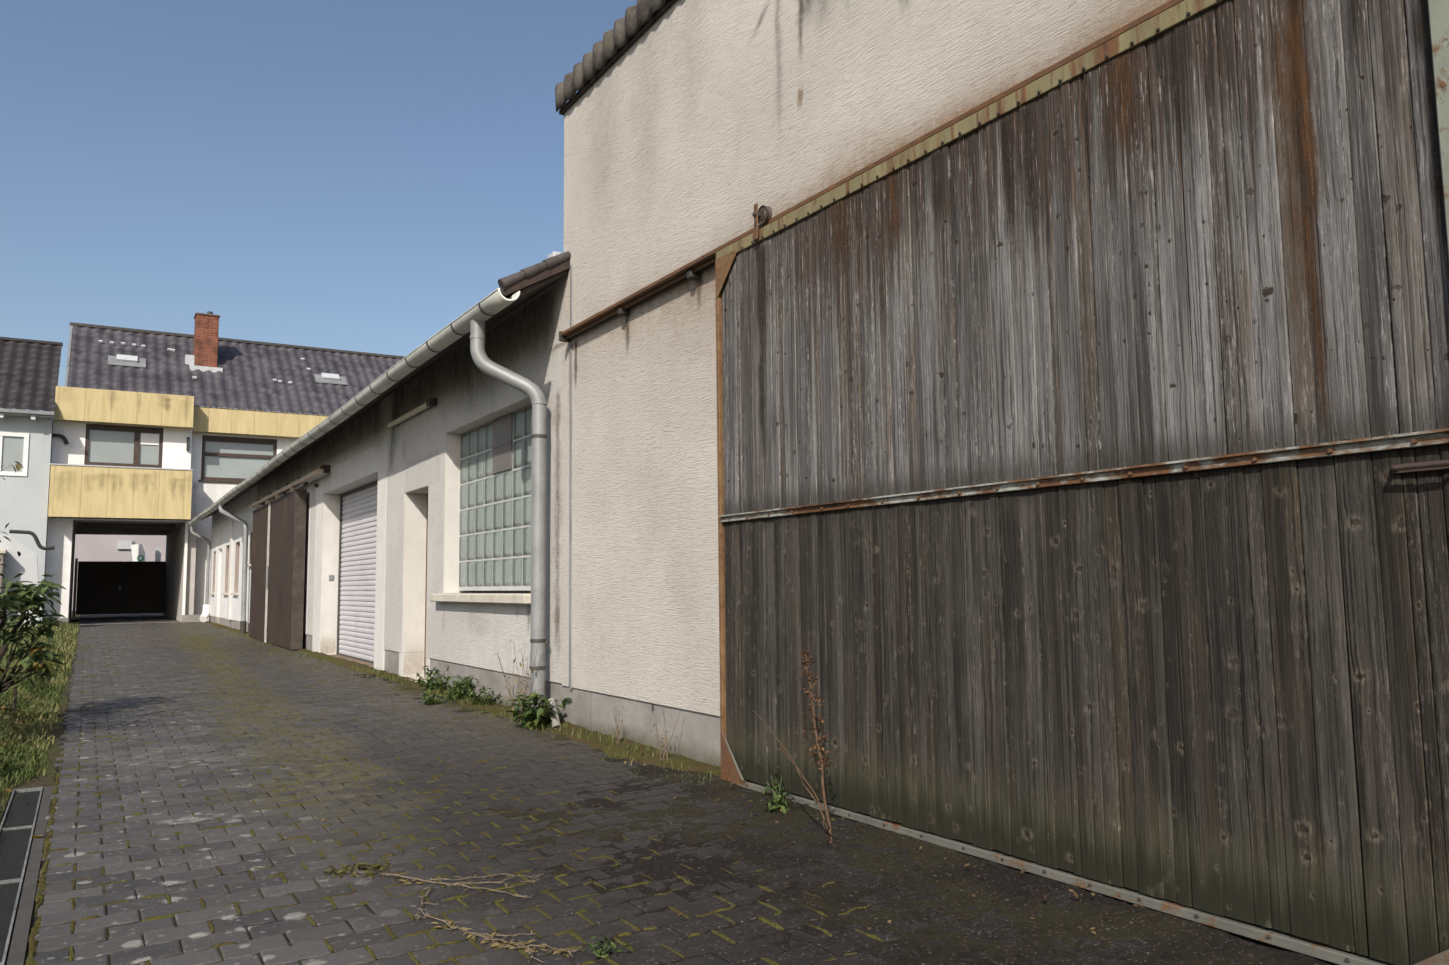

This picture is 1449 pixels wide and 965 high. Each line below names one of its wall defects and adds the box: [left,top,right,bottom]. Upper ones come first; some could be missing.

corrosion [1073,0,1170,52]